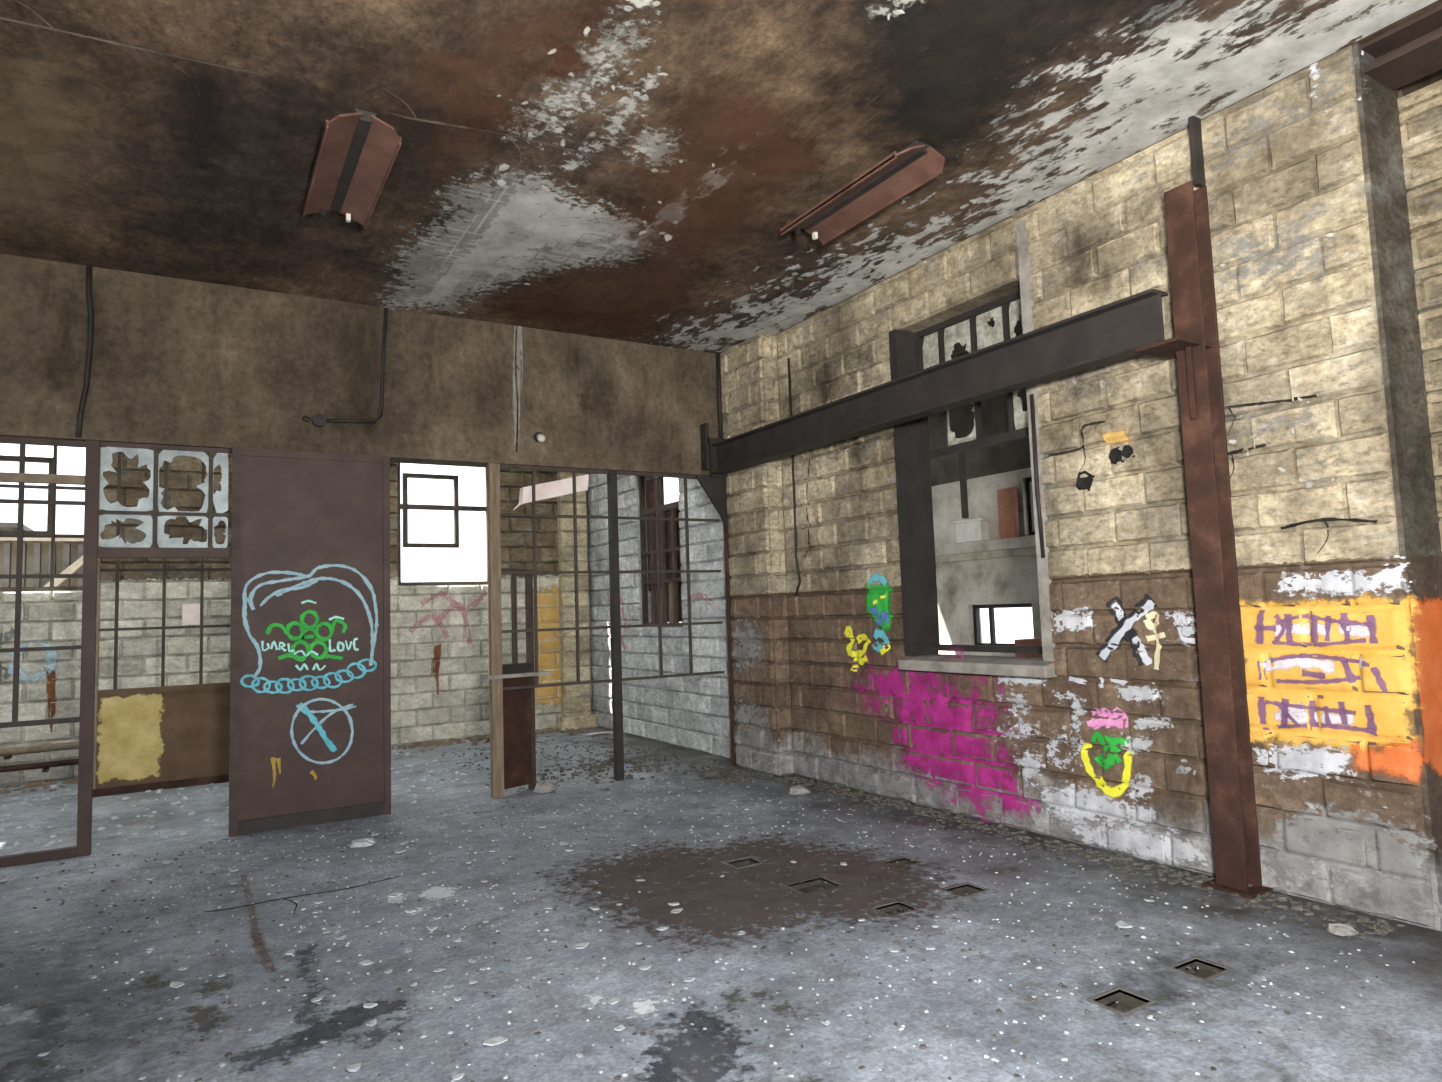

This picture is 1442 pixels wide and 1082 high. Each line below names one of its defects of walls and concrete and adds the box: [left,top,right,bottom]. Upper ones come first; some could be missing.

peeling [366,0,689,317]
peeling [624,0,1438,352]
peeling [1275,555,1413,599]
rust [46,669,57,732]
peeling [731,618,780,768]
peeling [1262,800,1442,923]